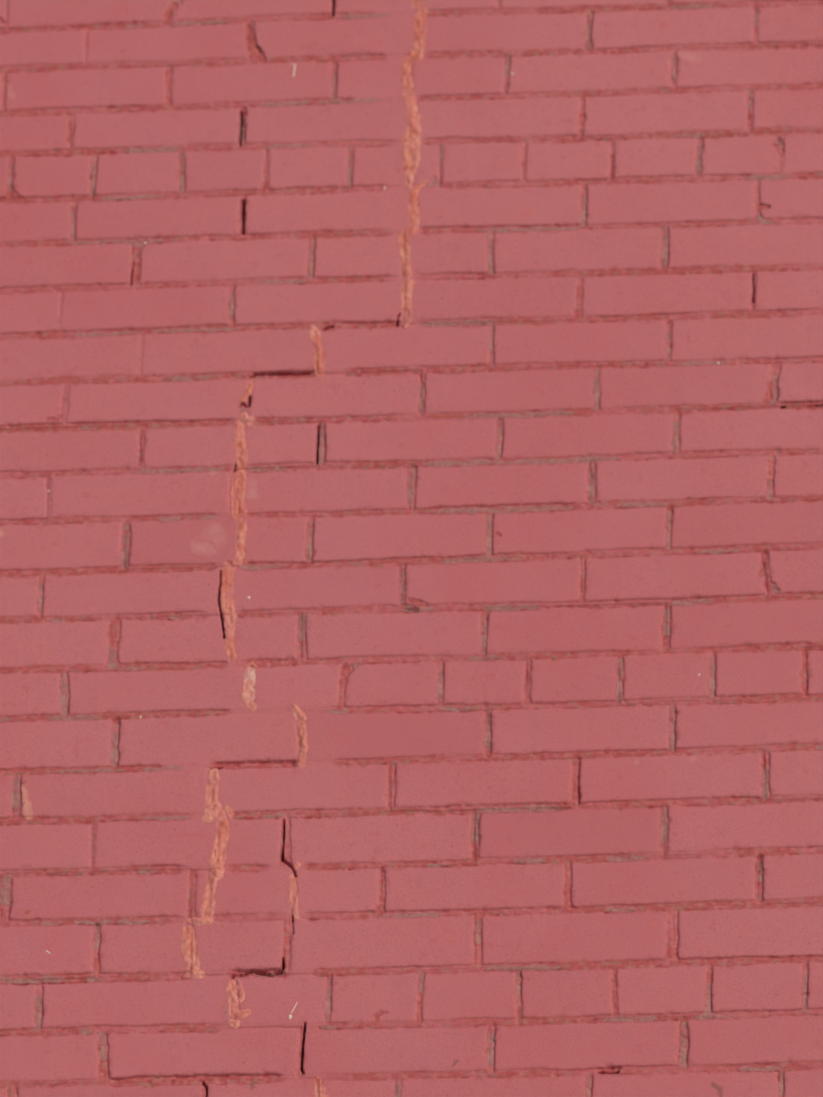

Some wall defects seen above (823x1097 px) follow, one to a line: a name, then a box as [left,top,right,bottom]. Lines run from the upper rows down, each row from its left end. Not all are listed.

crack [397,0,428,330]
crack [308,324,325,380]
crack [219,380,258,711]
crack [291,703,309,770]
crack [181,767,252,1030]
crack [282,826,303,923]
crack [301,1026,329,1097]